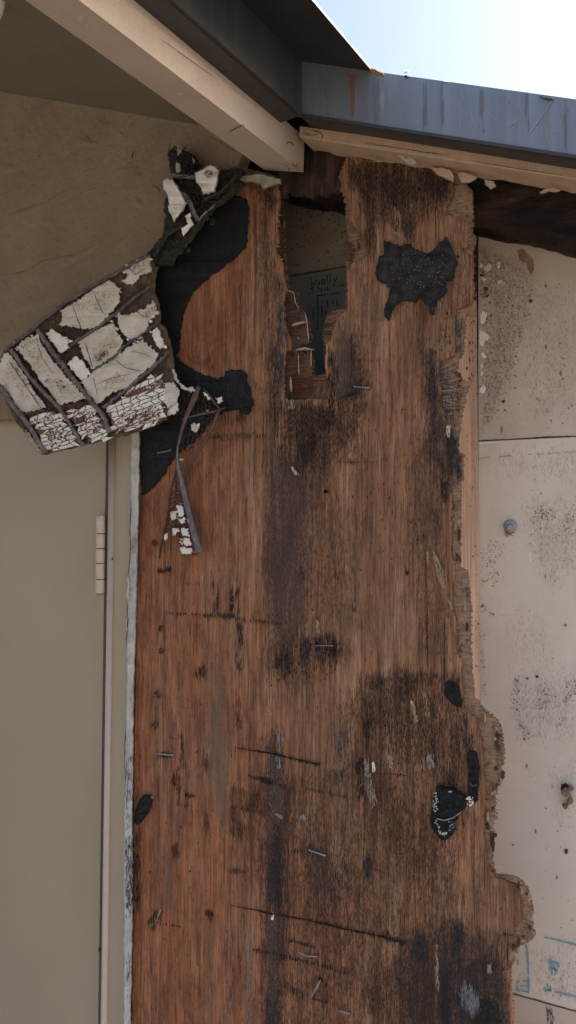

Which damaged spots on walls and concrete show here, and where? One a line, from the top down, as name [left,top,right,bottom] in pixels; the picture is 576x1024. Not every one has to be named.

crack [6,293,150,408]
damp [166,156,576,1024]